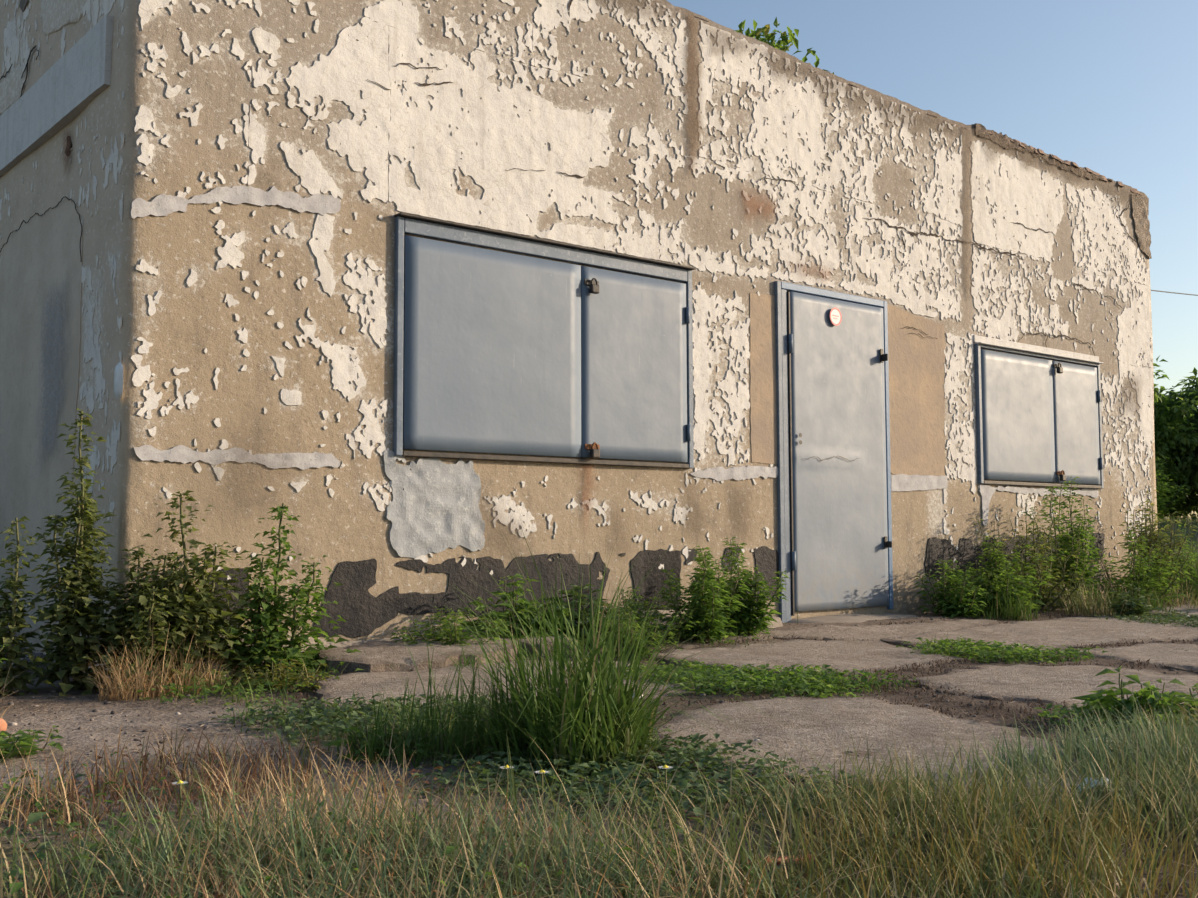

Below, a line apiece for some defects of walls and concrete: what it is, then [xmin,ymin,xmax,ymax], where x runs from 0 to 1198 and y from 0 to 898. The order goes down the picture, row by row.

peeling [2,0,76,77]
crack [0,196,82,260]
crack [865,218,1053,260]
peeling [62,0,1153,611]